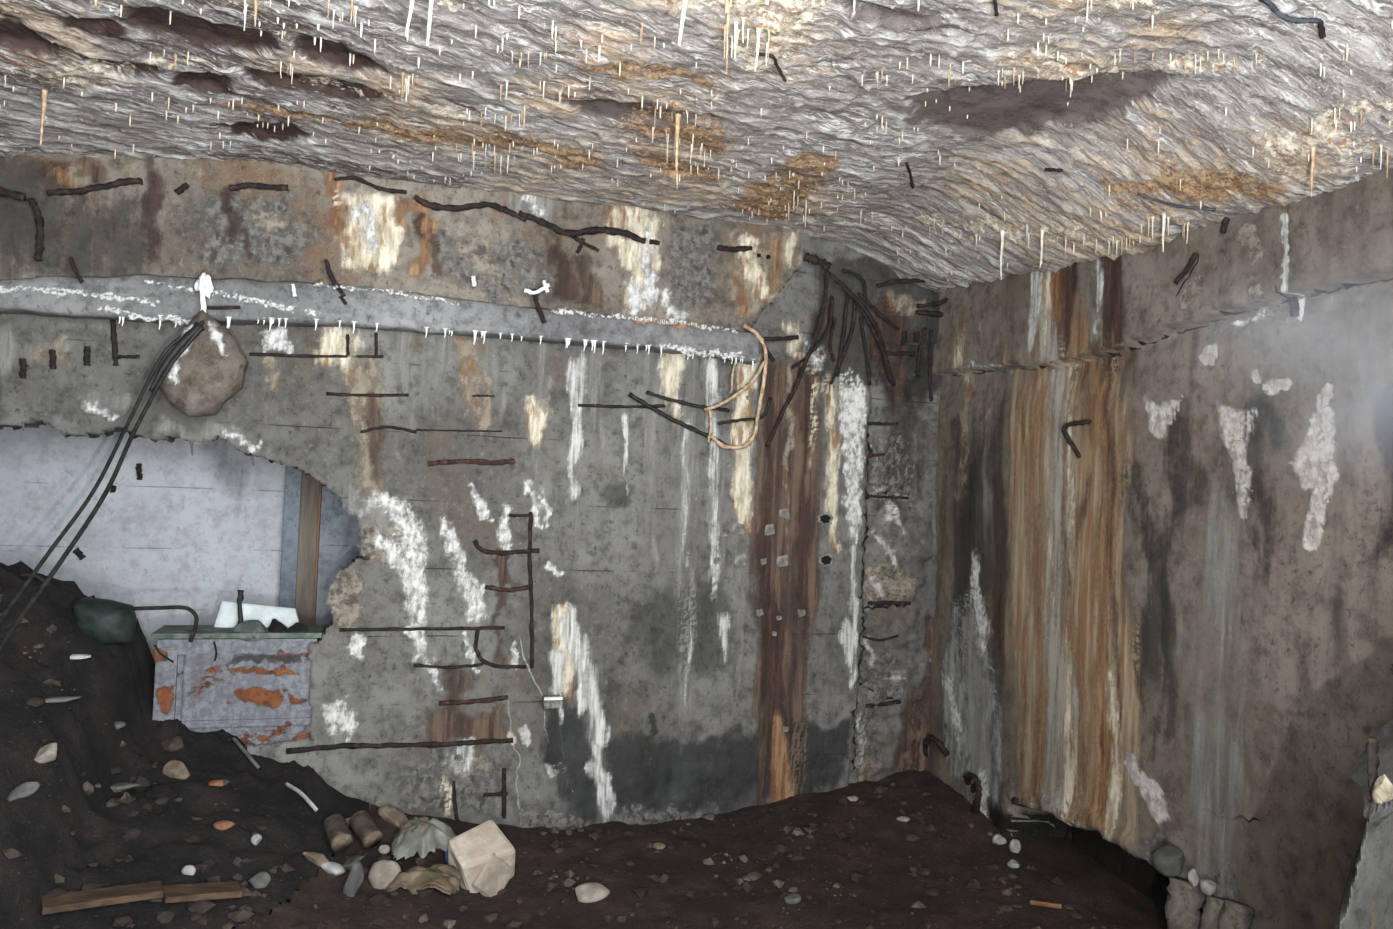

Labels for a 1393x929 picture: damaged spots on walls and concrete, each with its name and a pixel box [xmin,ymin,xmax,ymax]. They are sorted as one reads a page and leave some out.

leakage [2,53,210,92]
rust [405,195,442,276]
leakage [1227,311,1296,331]
leakage [440,737,473,815]
rust [750,349,822,805]
leakage [545,152,1170,906]
spalling [853,635,907,782]
spalling [863,422,916,605]
rust [1003,256,1141,852]
leakage [1134,409,1245,913]